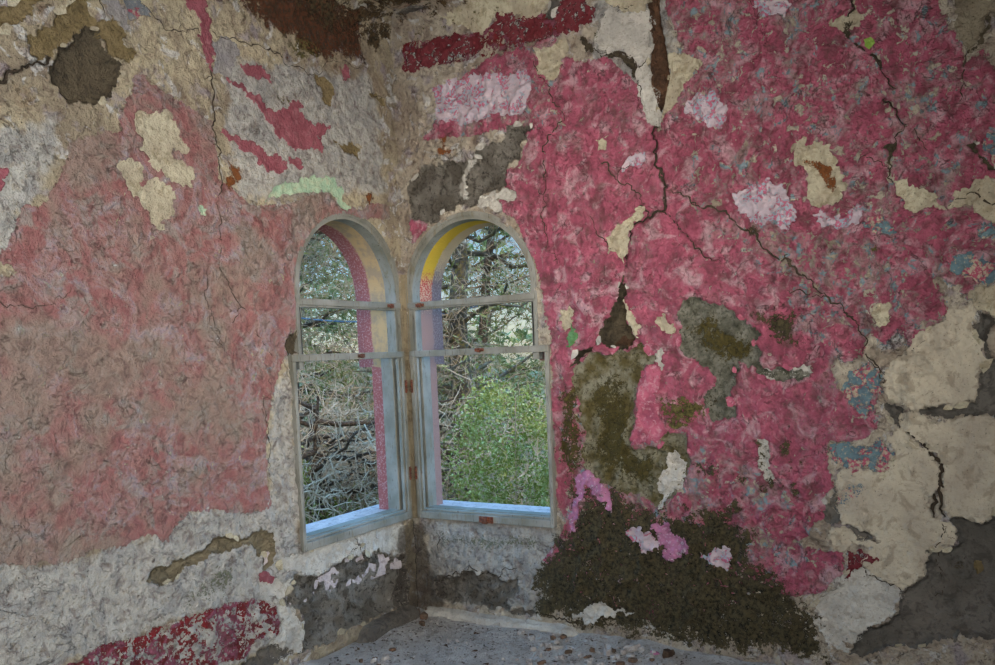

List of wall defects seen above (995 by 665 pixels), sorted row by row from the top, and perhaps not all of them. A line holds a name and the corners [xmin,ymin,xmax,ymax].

crack [0,57,51,85]
leakage [217,0,367,67]
spalling [402,0,728,224]
crack [845,0,927,183]
crack [590,47,924,384]
spalling [147,522,410,665]
spalling [559,206,692,533]
leakage [531,373,831,665]
leakage [686,316,752,369]
mould [749,304,804,349]
peeling [810,251,995,658]
crack [899,426,955,596]